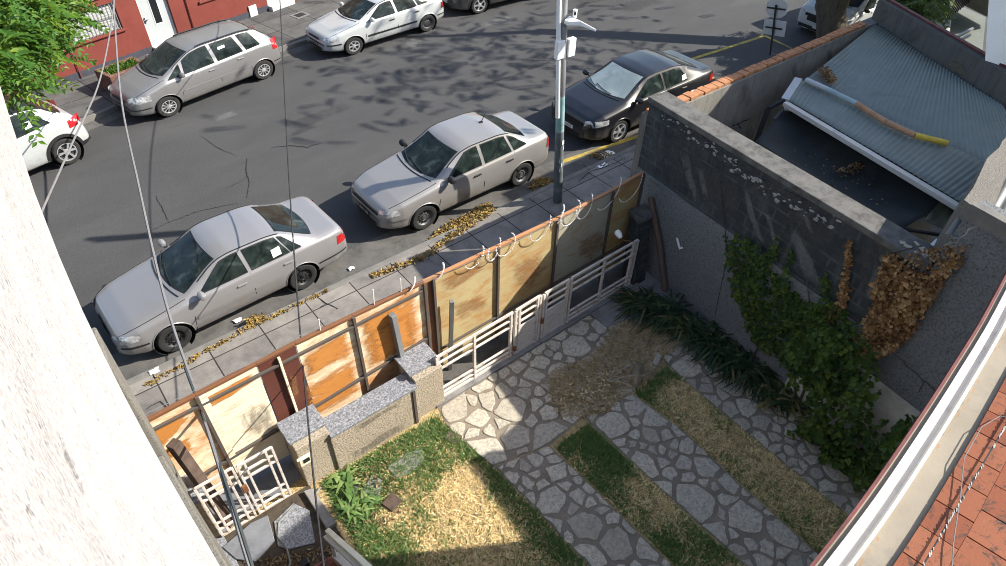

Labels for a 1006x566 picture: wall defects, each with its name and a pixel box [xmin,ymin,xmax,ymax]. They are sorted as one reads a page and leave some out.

rust [363,294,417,364]
rust [306,334,357,413]